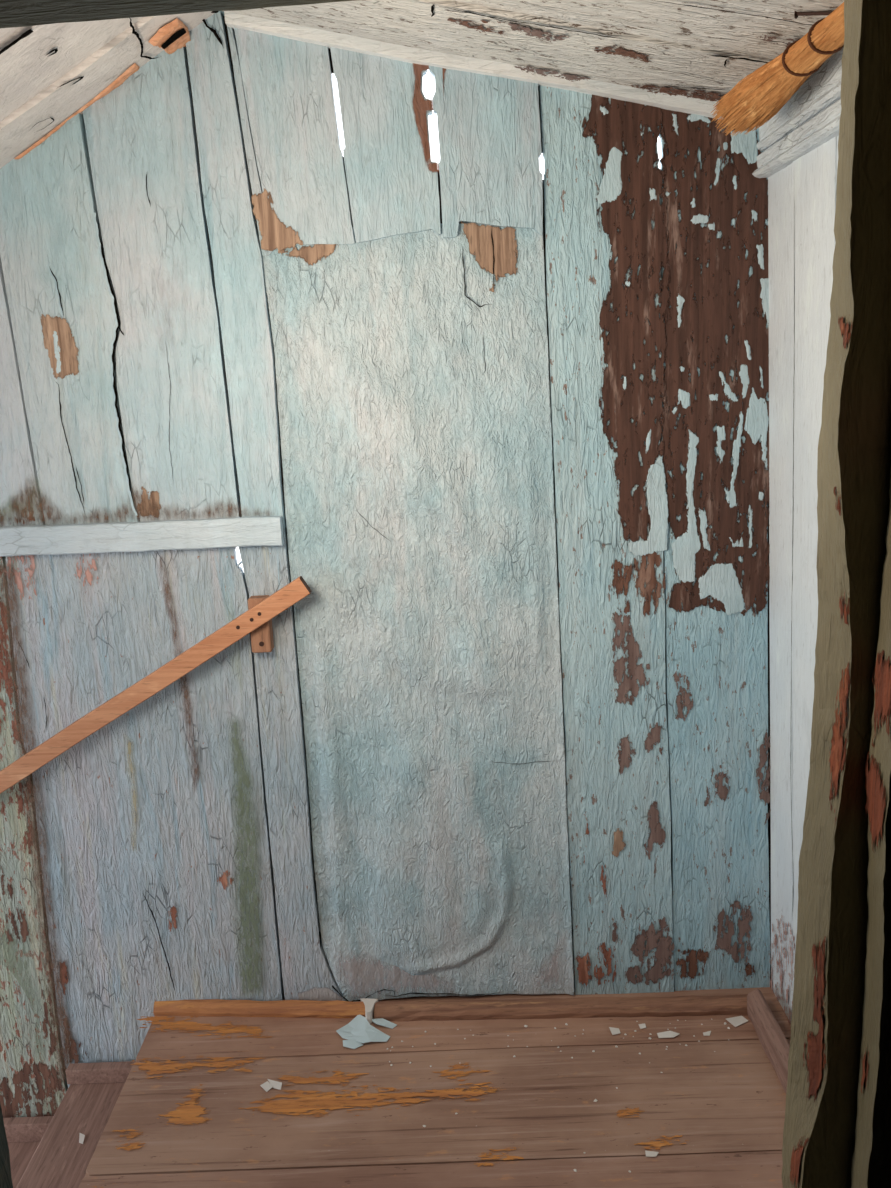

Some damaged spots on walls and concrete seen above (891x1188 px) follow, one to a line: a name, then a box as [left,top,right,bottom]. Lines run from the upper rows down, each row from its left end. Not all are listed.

crack [0,29,58,57]
peeling [251,188,336,266]
peeling [461,221,518,293]
peeling [40,314,80,379]
crack [93,213,138,516]
peeling [582,83,770,705]
leakage [0,487,60,524]
leakage [74,492,186,522]
peeling [617,722,663,775]
peeling [865,649,891,853]
peeling [574,900,755,986]
peeling [0,961,89,1118]